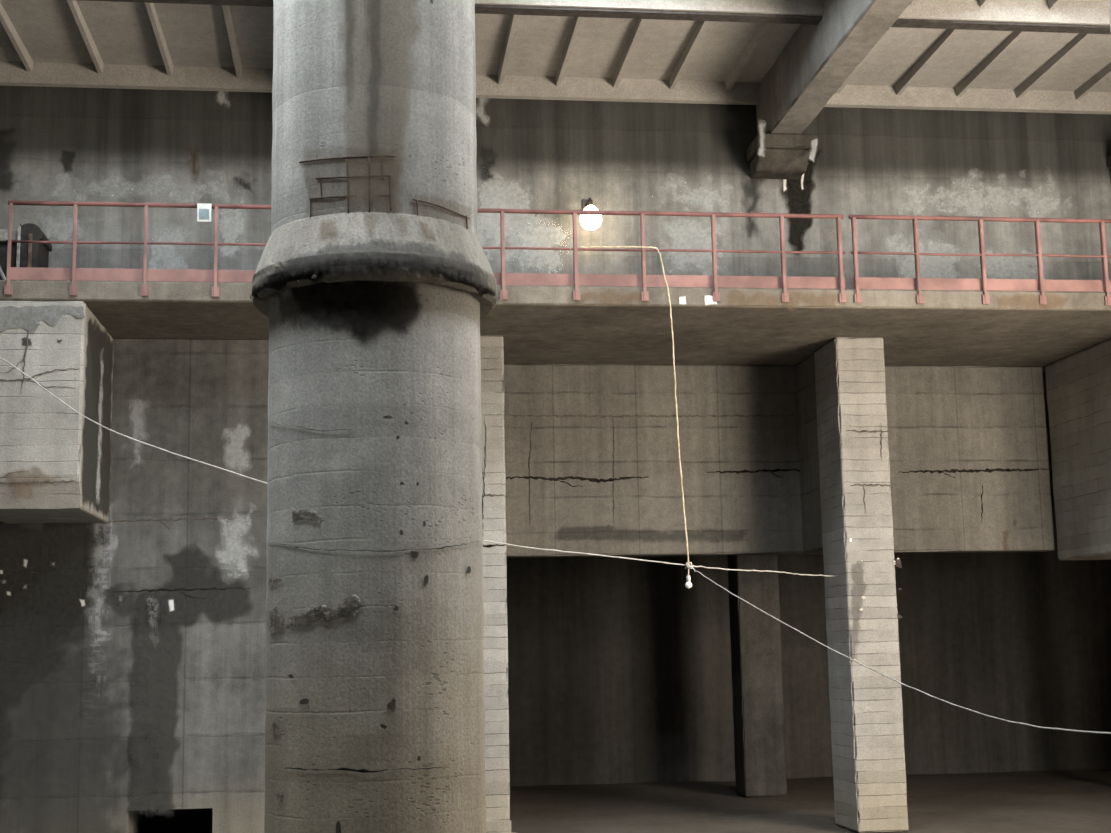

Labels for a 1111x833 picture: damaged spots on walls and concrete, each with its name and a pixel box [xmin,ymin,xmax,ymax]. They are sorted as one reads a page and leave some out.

water stain [745,120,766,237]
water stain [781,139,818,251]
water stain [0,319,251,814]
spalling [269,594,360,633]